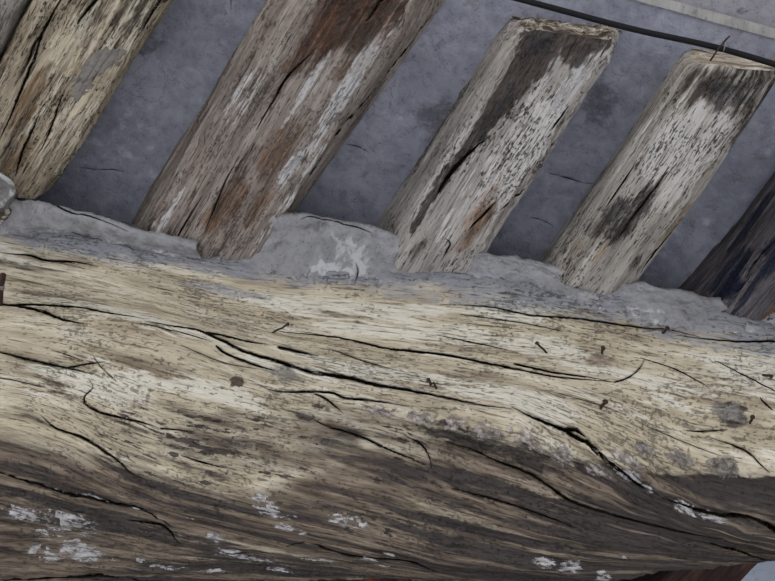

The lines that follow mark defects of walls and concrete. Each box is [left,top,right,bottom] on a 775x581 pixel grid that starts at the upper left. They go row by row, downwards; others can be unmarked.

crack [0,303,775,531]
crack [0,472,181,544]
crack [286,542,434,571]
crack [444,441,771,561]